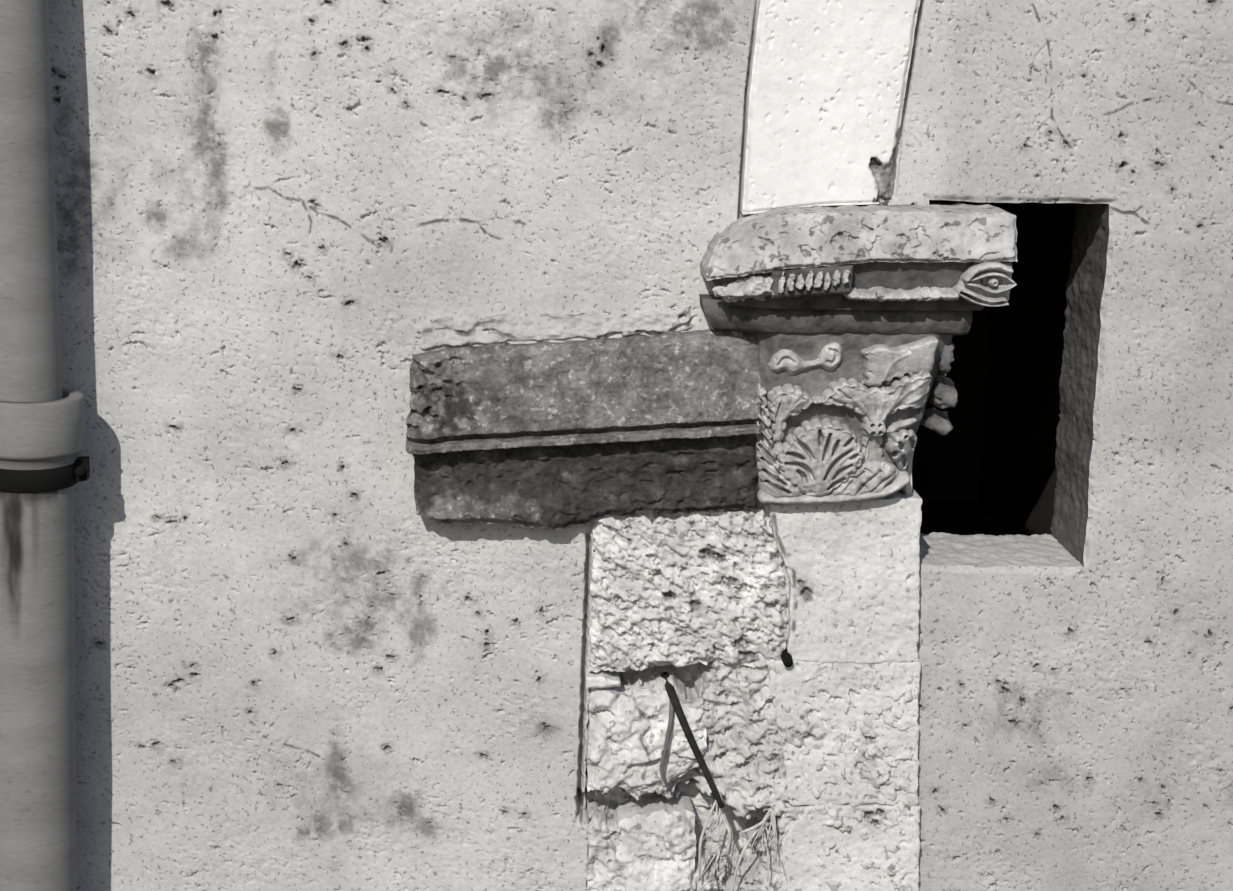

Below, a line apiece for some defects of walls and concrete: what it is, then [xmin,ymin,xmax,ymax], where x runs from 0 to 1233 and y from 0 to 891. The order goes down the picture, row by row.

water stain [602,26,616,57]
water stain [685,0,726,50]
water stain [485,55,547,94]
water stain [57,156,94,267]
crack [256,178,372,243]
crack [421,219,525,239]